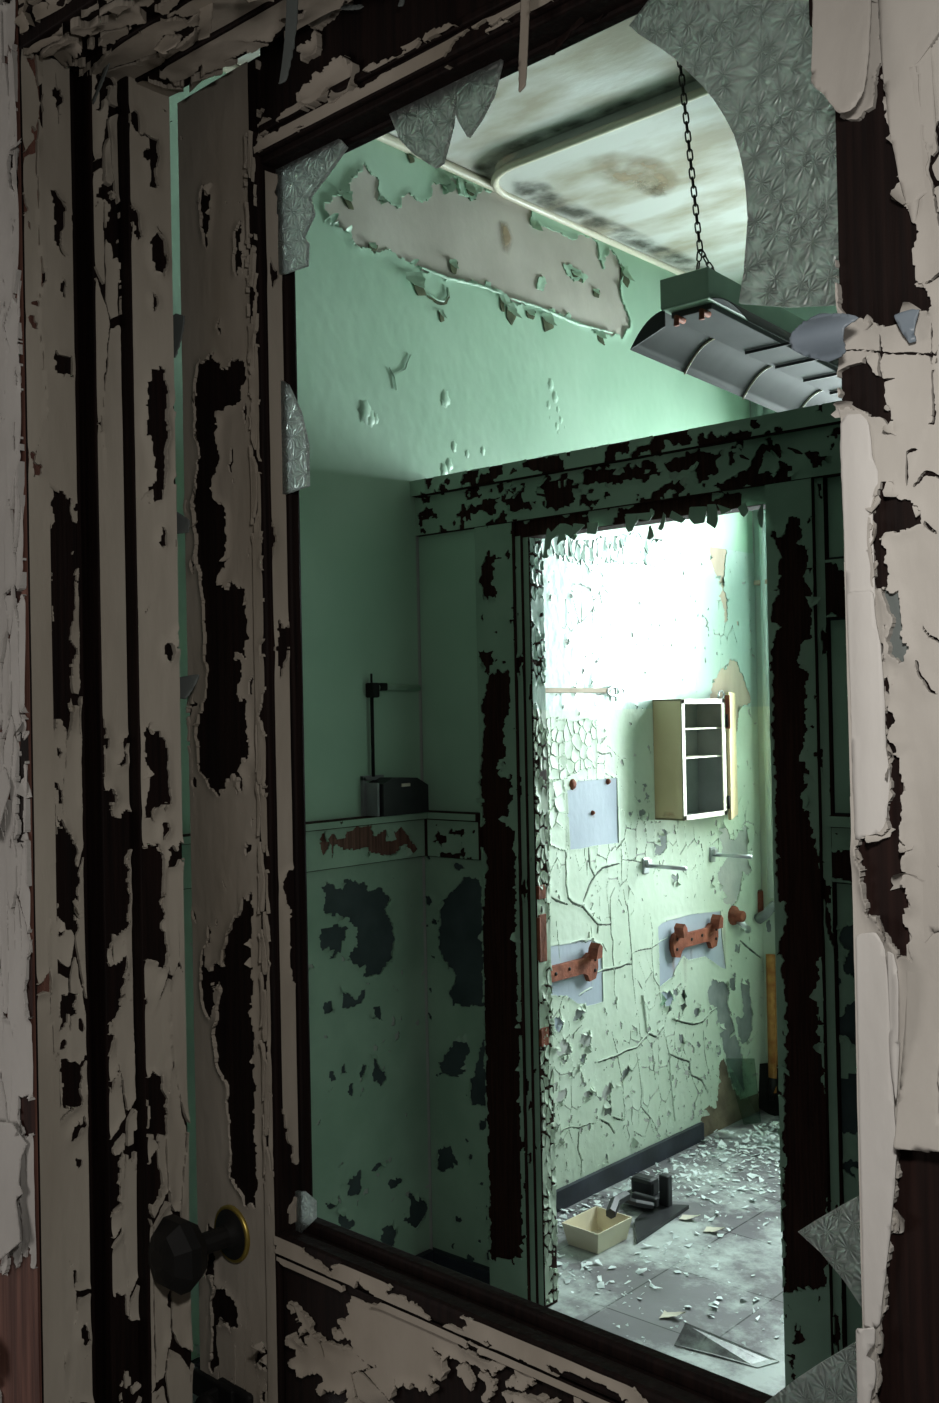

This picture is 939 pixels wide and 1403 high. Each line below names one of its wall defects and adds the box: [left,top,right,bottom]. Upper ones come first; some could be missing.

spalling [324,164,635,345]
crack [929,124,939,186]
peeling [49,483,77,728]
peeling [177,355,249,796]
peeling [567,778,649,850]
peeling [456,444,794,558]
peeling [766,0,939,1403]
crack [907,423,939,486]
crack [917,631,939,694]
peeling [201,892,258,1208]
peeling [438,650,524,1261]
crack [547,717,717,1175]